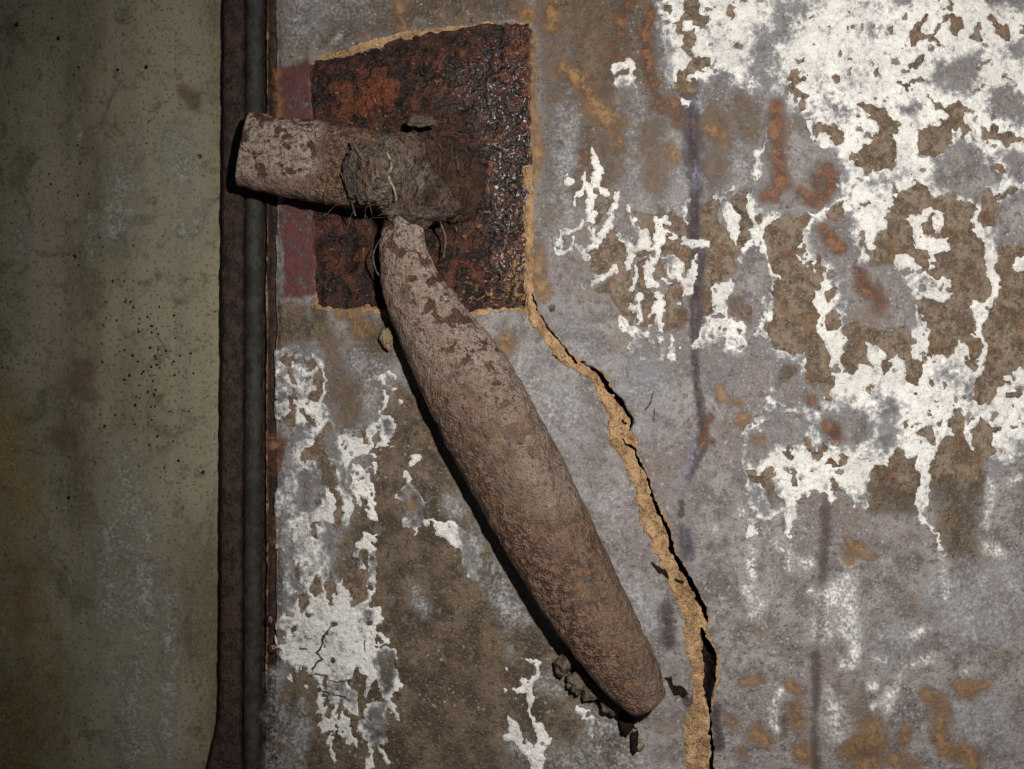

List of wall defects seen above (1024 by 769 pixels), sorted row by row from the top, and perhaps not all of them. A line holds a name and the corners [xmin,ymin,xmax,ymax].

rust [761,99,839,209]
peeling [552,0,1024,551]
rust [819,224,846,255]
rust [854,263,885,309]
crack [522,165,720,769]
peeling [274,346,403,769]
peeling [503,658,552,769]
rust [841,714,918,769]
rust [921,680,990,769]